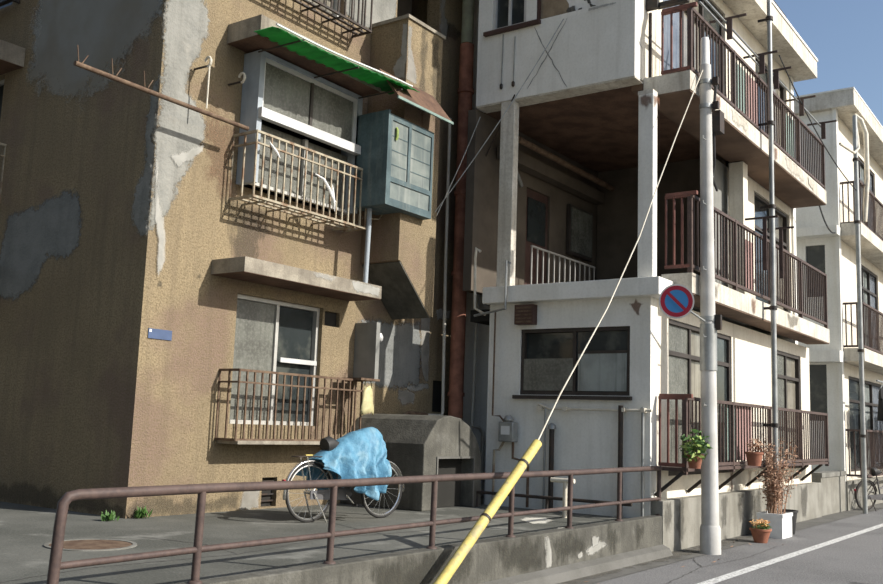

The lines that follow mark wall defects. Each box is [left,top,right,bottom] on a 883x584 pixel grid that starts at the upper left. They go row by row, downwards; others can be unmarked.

peeling [28,0,163,96]
leakage [393,23,416,83]
peeling [172,146,203,166]